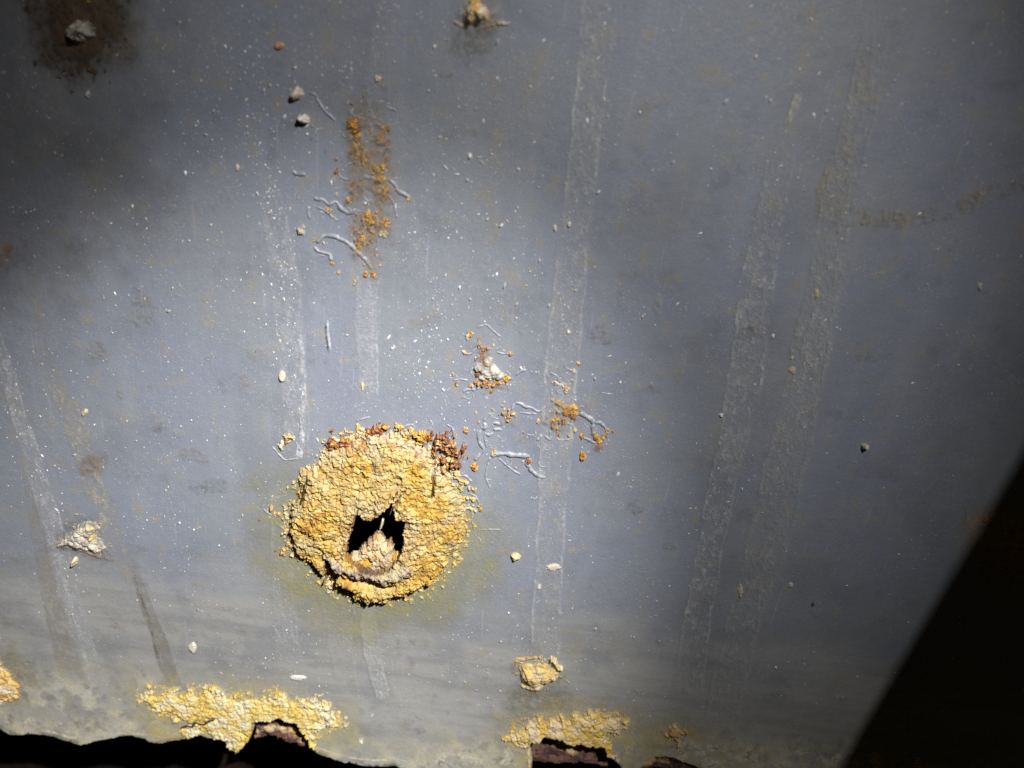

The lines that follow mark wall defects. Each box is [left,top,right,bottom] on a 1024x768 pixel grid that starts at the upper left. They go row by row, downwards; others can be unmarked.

rust [297,75,411,291]
rust [258,324,615,634]
rust [0,657,29,705]
rust [132,681,353,753]
rust [497,706,700,768]